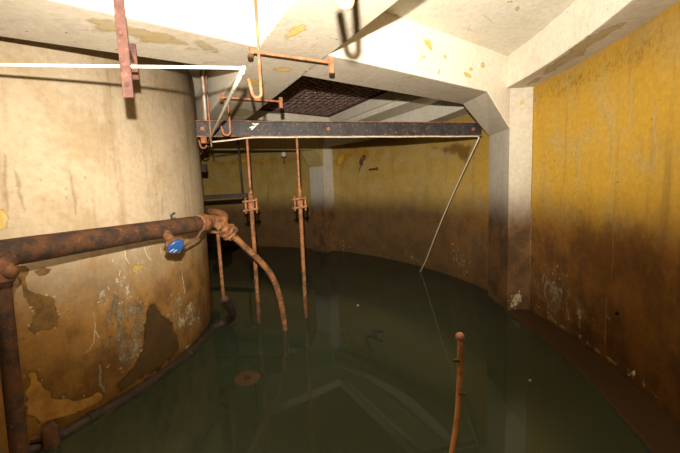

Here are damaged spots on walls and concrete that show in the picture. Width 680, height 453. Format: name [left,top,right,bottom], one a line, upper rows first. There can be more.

leakage [89,19,116,31]
leakage [127,28,184,44]
leakage [528,21,629,85]
peeling [16,265,60,334]
peeling [107,290,147,373]
peeling [167,291,200,331]
peeling [23,368,104,427]